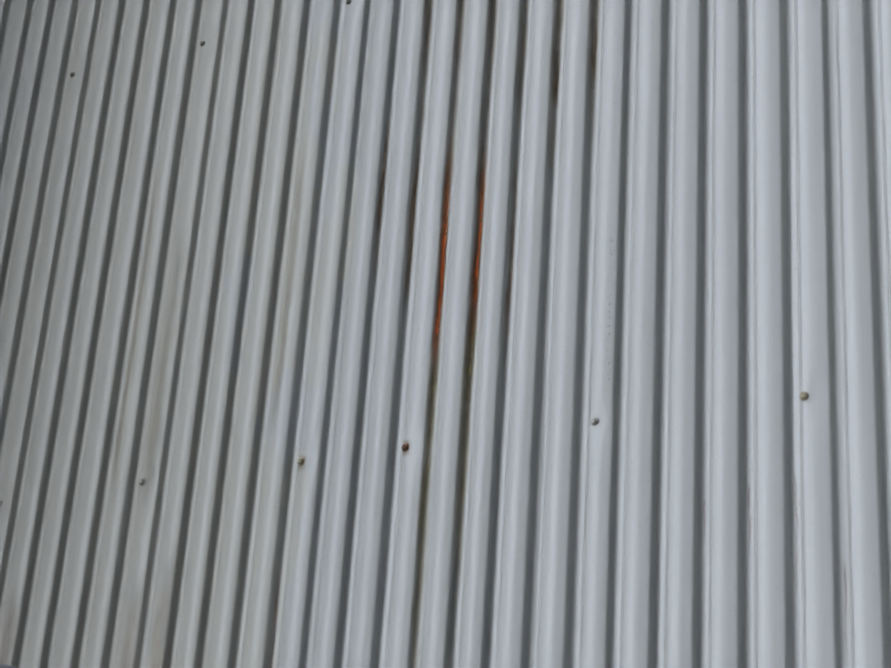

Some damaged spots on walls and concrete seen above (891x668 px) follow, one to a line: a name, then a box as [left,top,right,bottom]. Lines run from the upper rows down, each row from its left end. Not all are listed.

rust [434,182,449,345]
rust [473,177,483,303]